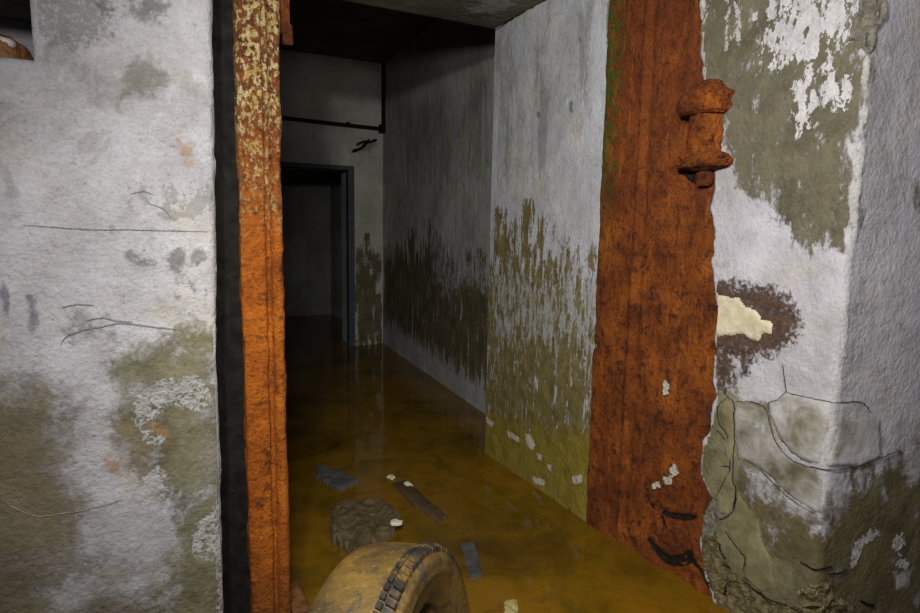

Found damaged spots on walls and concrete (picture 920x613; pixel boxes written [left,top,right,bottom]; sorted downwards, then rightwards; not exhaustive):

peeling [700,0,711,25]
peeling [724,0,742,52]
peeling [752,0,888,139]
water stain [355,198,598,522]
flaking render [716,295,773,341]
water stain [0,325,223,613]
water stain [701,373,920,613]